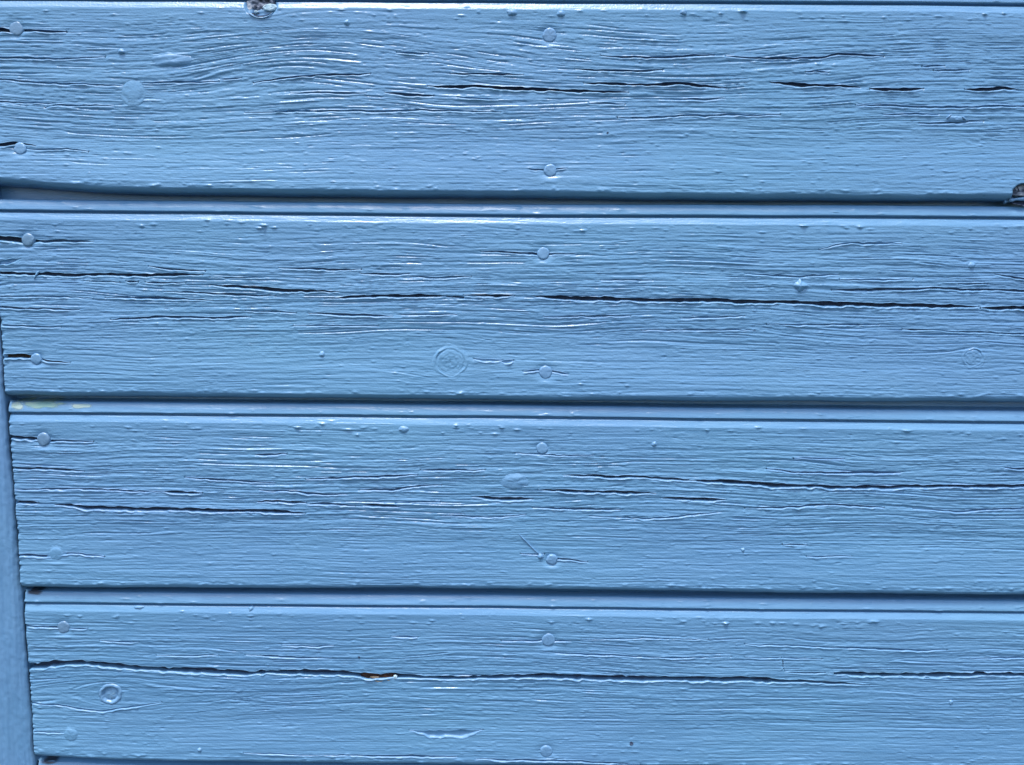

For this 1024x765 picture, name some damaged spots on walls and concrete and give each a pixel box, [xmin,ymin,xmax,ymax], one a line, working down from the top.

crack [0,26,1024,127]
crack [0,241,1024,365]
crack [11,435,1024,522]
crack [27,624,1024,687]